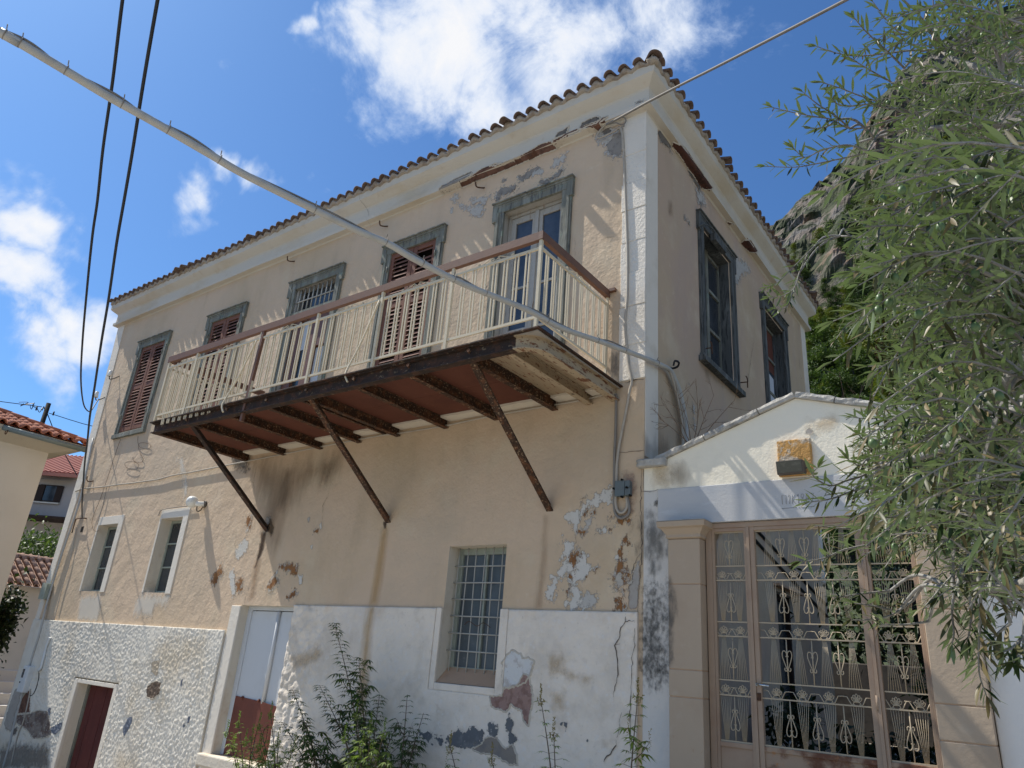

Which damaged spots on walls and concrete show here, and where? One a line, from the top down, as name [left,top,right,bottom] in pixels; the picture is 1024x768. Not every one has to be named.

spalling [438,115,625,218]
spalling [146,680,162,700]
peeling [266,561,303,601]
peeling [419,649,535,766]
peeling [545,477,634,612]
crack [604,450,658,761]
leakage [642,592,673,688]